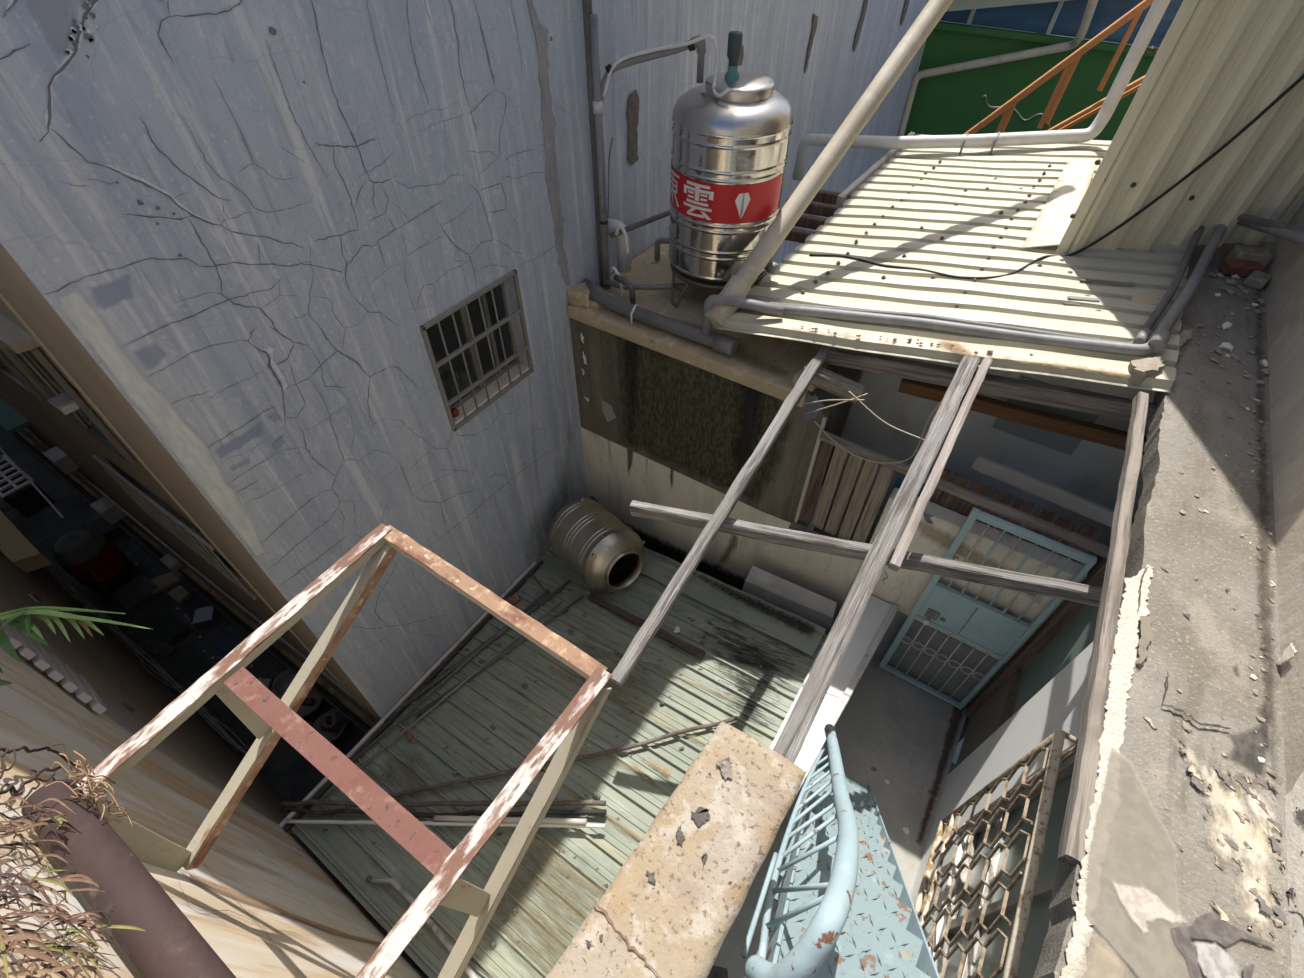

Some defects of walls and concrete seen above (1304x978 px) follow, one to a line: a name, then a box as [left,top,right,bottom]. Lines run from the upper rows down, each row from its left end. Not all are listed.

crack [3,0,17,18]
crack [0,44,30,60]
crack [39,0,572,652]
spalling [1137,616,1154,664]
peeling [1278,643,1298,663]
spalling [676,807,710,845]
peeling [1113,737,1304,978]
corrosion [190,875,381,945]